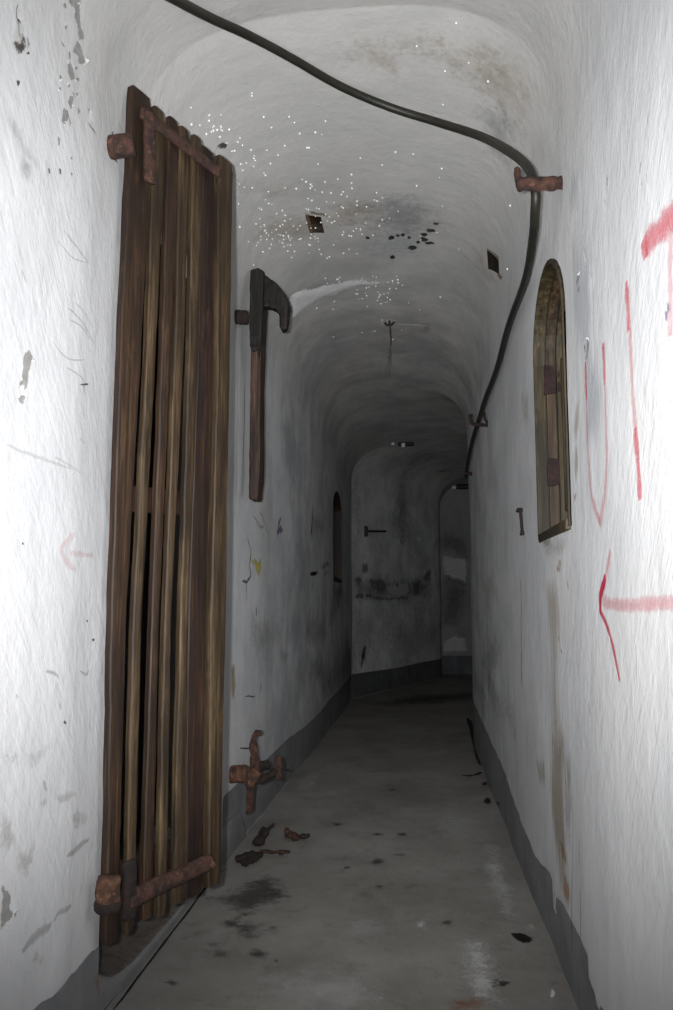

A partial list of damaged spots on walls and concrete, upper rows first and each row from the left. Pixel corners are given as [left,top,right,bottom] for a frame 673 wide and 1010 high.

peeling [58,0,94,125]
leakage [389,222,439,250]
flaking render [18,350,35,403]